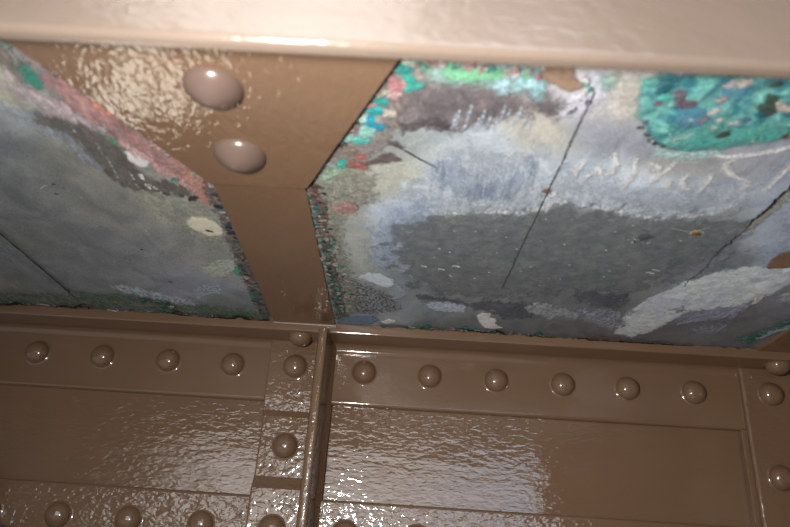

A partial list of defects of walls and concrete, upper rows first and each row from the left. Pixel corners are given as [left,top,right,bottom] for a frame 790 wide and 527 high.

crack [684,185,790,287]